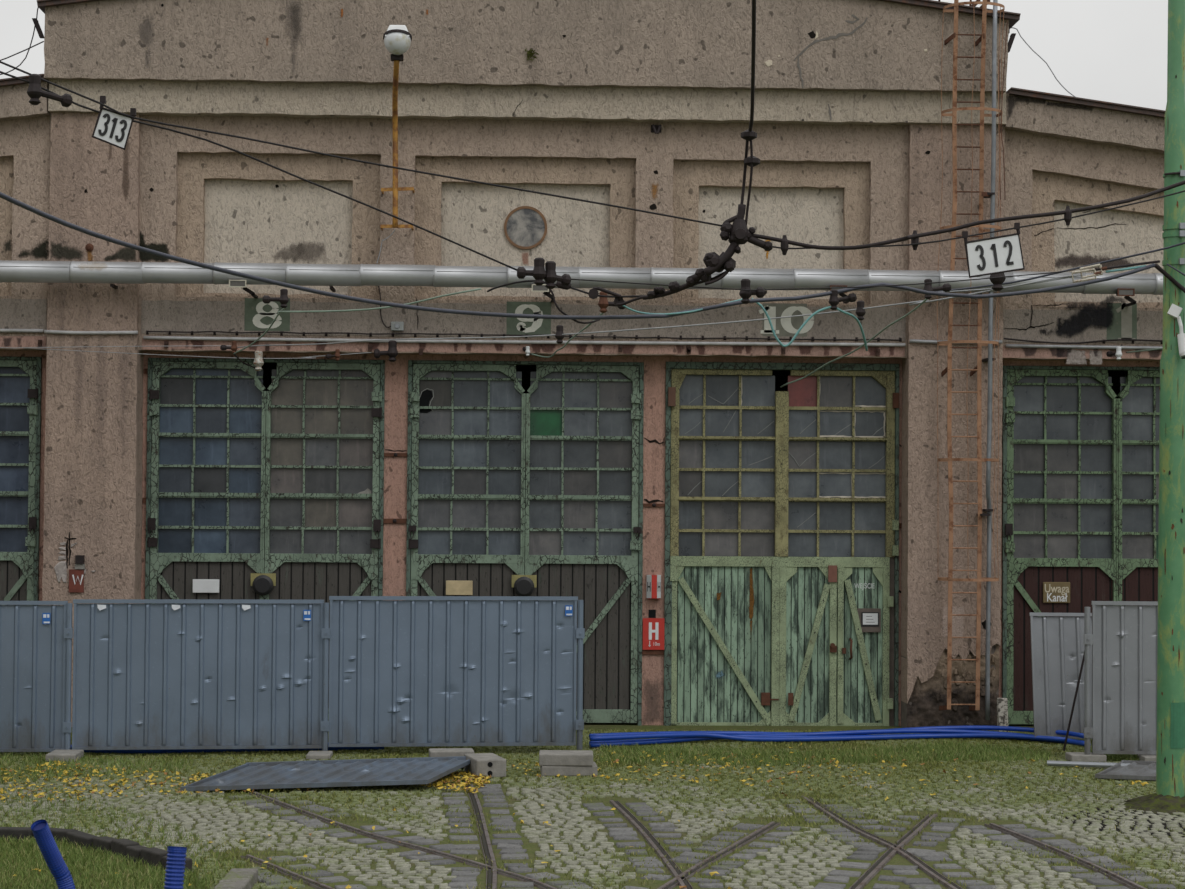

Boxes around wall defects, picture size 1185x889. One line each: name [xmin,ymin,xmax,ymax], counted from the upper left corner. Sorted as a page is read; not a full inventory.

crack [794,14,867,88]
flaking render [907,644,1000,728]